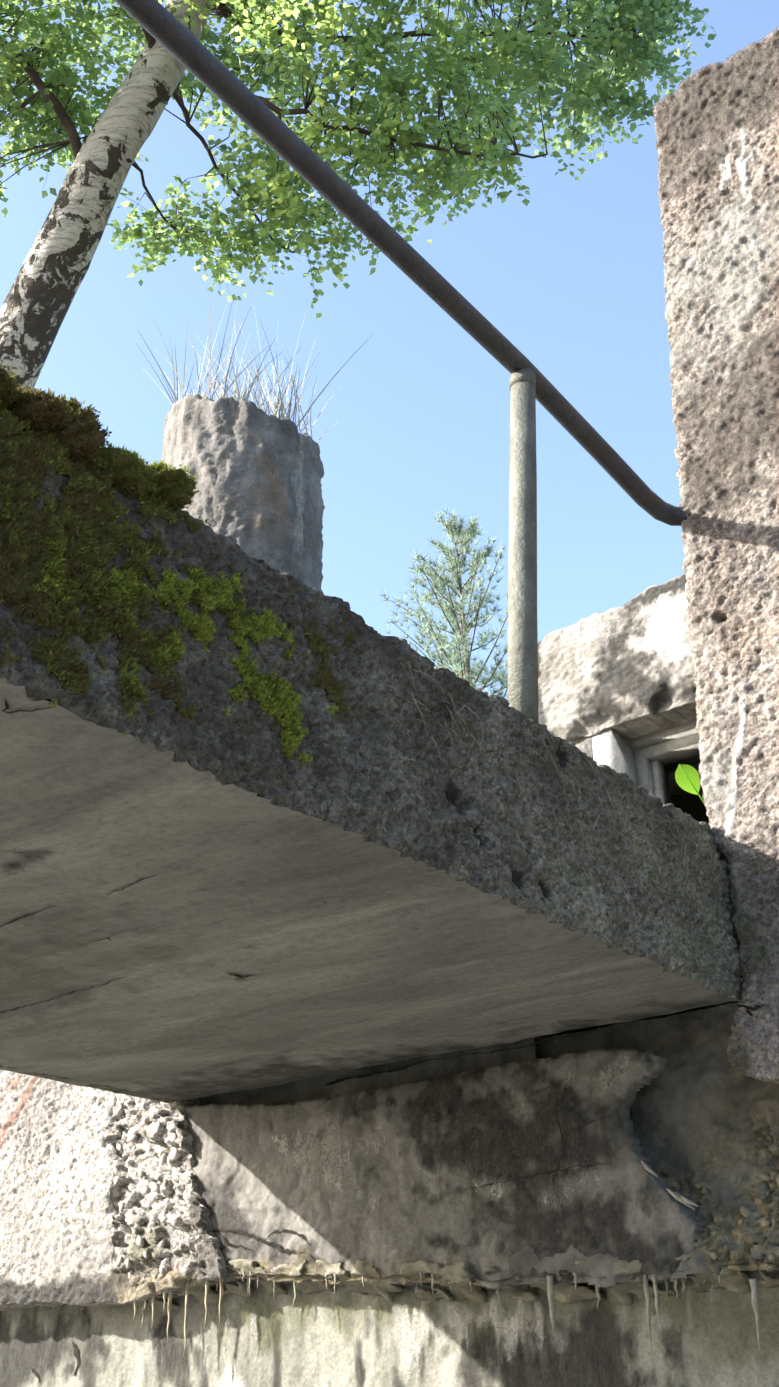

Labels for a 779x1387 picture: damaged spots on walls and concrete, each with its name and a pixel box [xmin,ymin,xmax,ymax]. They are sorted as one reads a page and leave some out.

rust [0,1073,36,1147]
water stain [0,1227,127,1387]
water stain [110,1049,779,1387]
spalling [509,1002,779,1287]